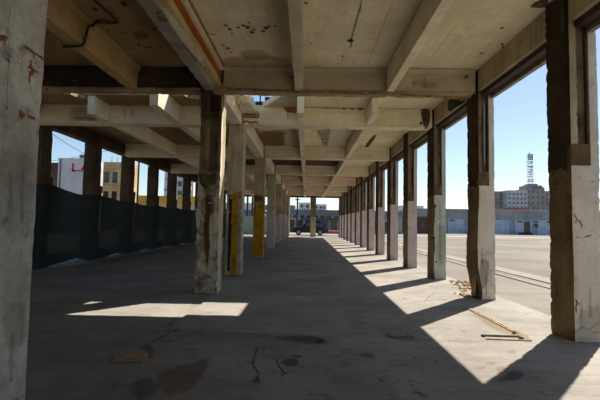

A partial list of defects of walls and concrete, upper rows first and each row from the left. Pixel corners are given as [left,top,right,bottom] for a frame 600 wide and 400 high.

crack [342,1,393,63]
rust [24,45,44,83]